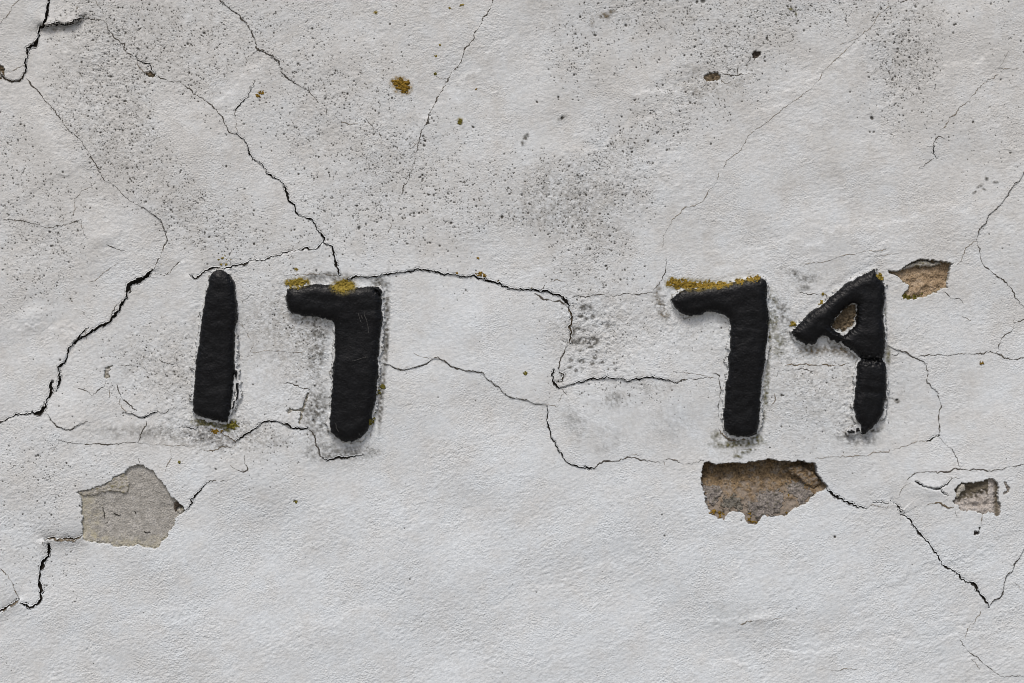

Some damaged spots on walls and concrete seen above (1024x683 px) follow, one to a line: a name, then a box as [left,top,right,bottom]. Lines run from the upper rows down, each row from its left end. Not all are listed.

crack [919,56,1017,168]
crack [0,0,906,510]
spalling [888,259,950,299]
crack [815,172,1024,677]
spalling [78,465,185,548]
spalling [701,459,827,525]
spalling [953,479,1010,516]
crack [0,535,81,613]